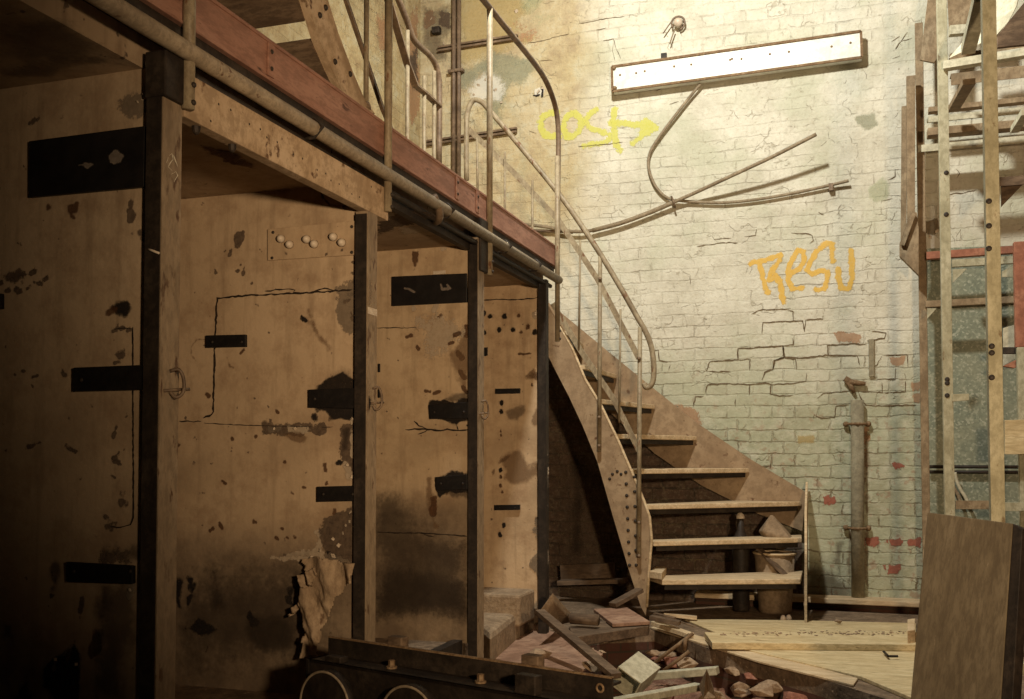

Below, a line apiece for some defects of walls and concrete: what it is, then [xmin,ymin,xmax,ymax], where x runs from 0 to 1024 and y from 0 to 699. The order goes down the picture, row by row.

crack [405,421,468,434]
crack [693,308,914,431]
peeling [286,504,355,659]